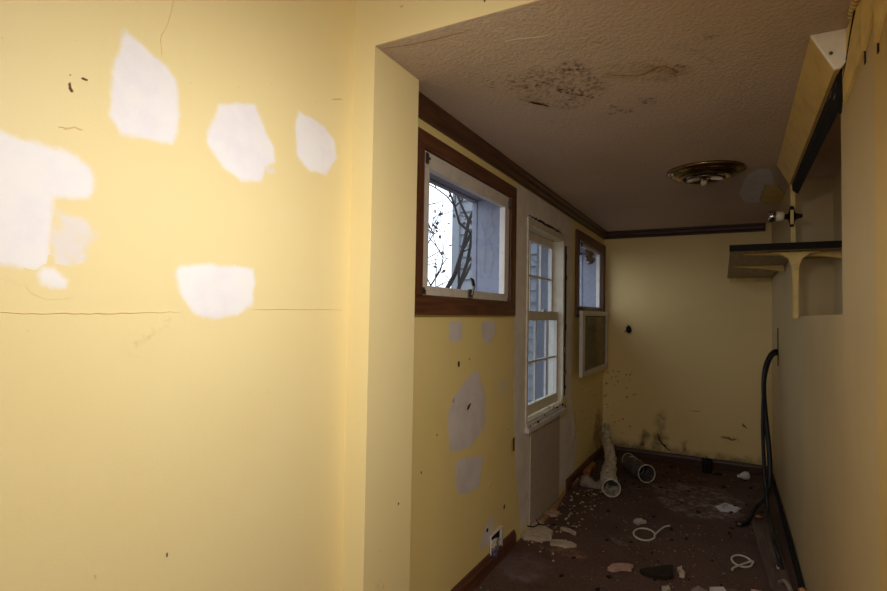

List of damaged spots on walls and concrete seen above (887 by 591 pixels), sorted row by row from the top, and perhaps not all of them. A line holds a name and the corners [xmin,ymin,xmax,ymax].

damp [465,41,652,121]